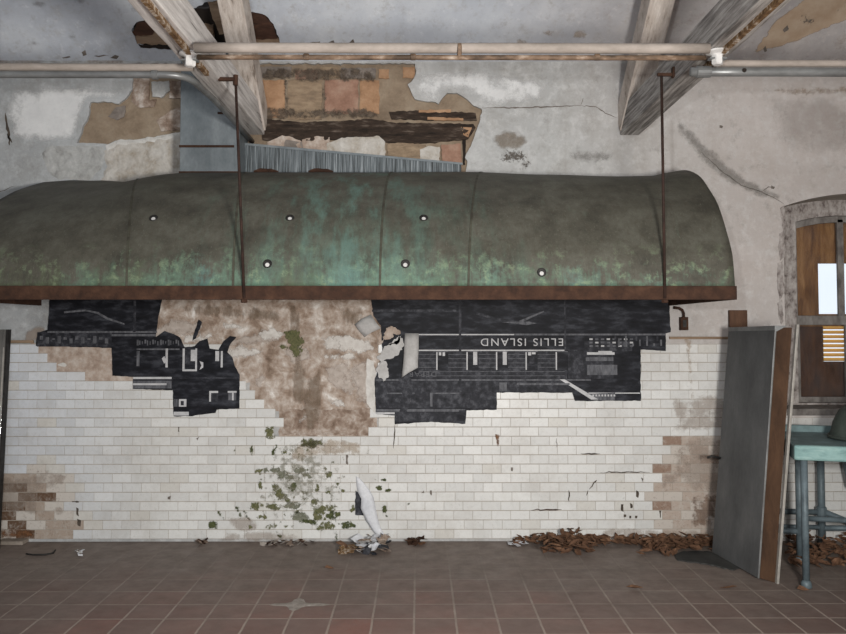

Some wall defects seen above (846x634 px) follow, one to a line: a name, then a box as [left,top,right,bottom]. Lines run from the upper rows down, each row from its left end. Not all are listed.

flaking render [79,71,181,144]
flaking render [248,64,482,172]
crack [703,154,782,203]
peeling [156,300,381,436]
damp [693,497,716,525]